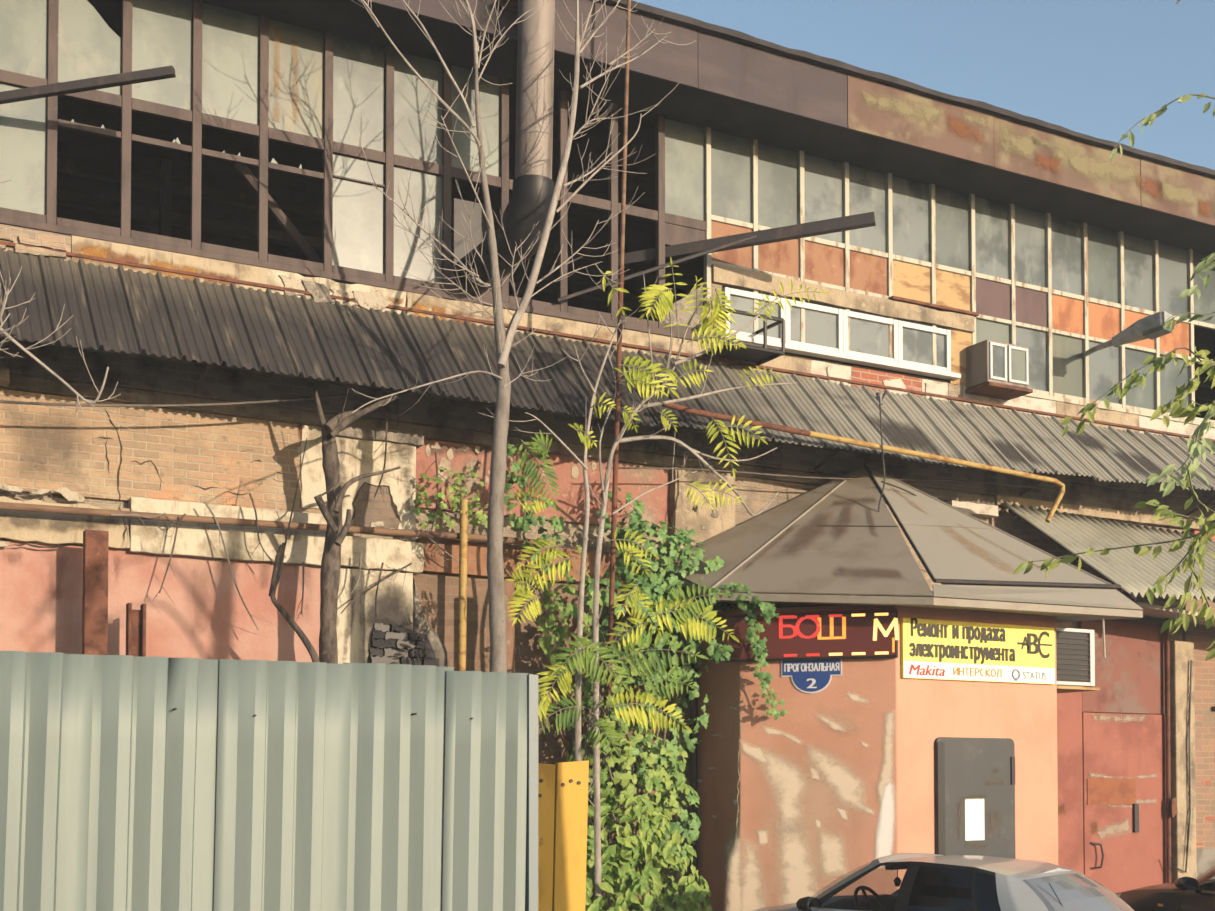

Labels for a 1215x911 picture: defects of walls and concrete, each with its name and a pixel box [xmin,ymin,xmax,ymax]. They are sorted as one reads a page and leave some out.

peeling [864,93,986,141]
peeling [1002,127,1215,215]
spalling [0,232,66,259]
spalling [278,275,392,311]
spalling [0,484,85,503]
spalling [13,517,108,531]
crack [97,408,162,547]
spalling [340,440,401,529]
peeling [398,444,490,491]
peeling [571,462,596,479]
peeling [626,506,655,527]
peeling [725,712,895,911]